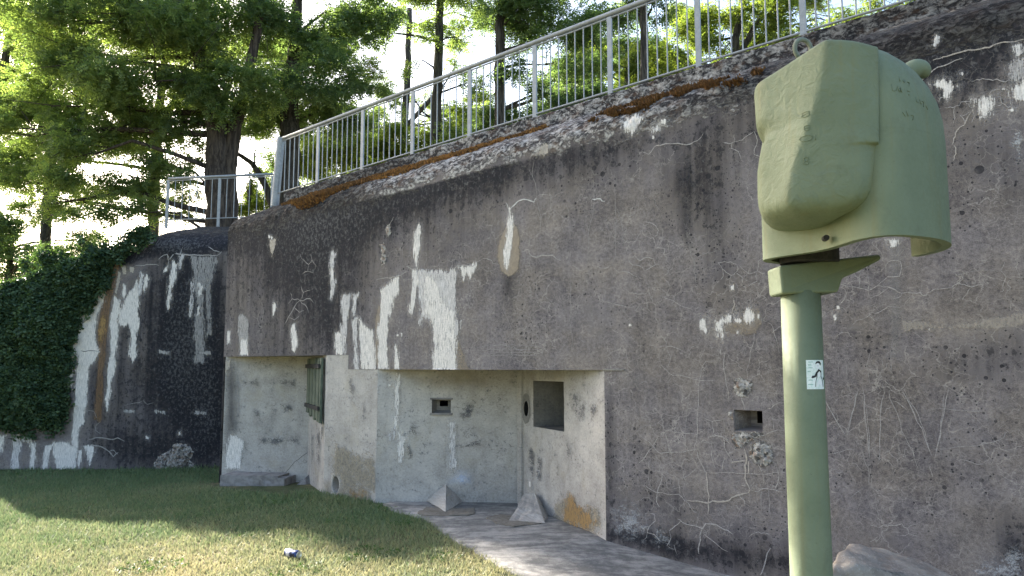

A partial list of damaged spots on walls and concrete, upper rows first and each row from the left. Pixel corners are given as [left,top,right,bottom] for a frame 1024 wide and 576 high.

crack [256,255,315,328]
crack [476,132,785,554]
spalling [733,378,753,397]
crack [824,260,1022,476]
spalling [154,443,195,469]
spalling [728,411,774,467]
corrosion [553,491,601,534]